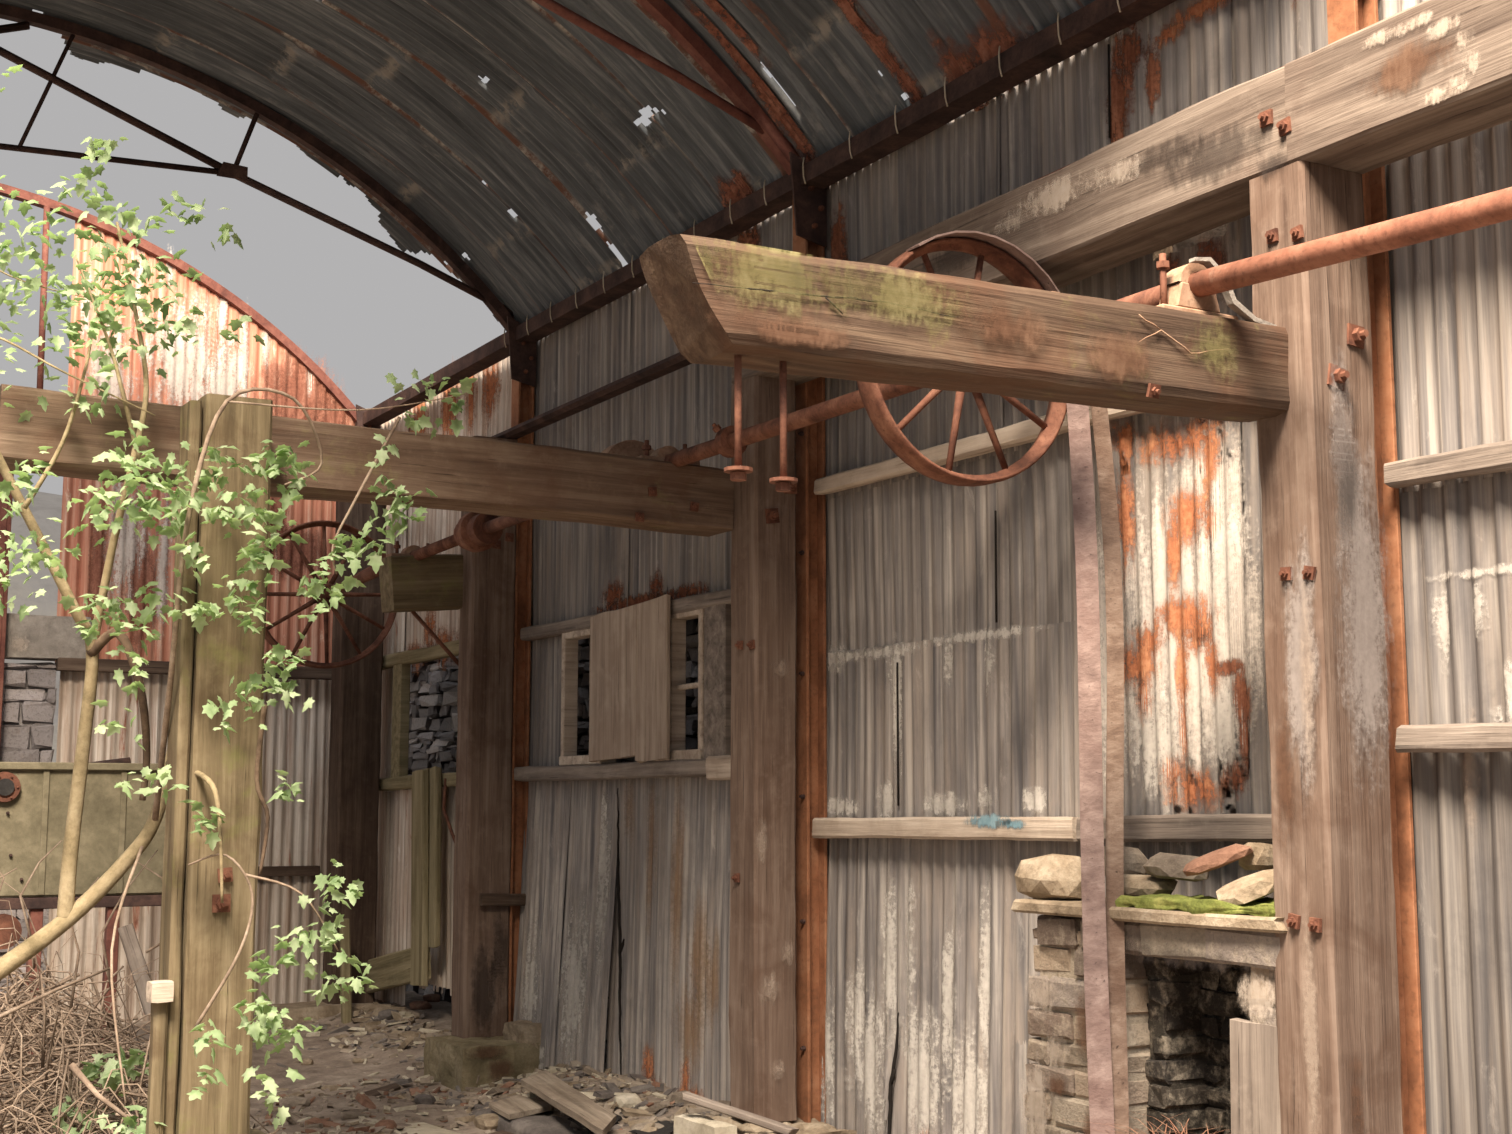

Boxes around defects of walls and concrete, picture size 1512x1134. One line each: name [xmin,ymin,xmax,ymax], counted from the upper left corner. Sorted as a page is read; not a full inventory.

corrosion [687,0,817,162]
corrosion [833,0,923,104]
corrosion [932,17,1032,83]
corrosion [1108,0,1226,143]
corrosion [737,225,761,248]
corrosion [828,187,848,261]
corrosion [1166,254,1179,273]
corrosion [1197,237,1227,269]
corrosion [262,353,351,425]
corrosion [597,571,708,613]
corrosion [1112,418,1251,814]
leakage [827,626,1041,818]